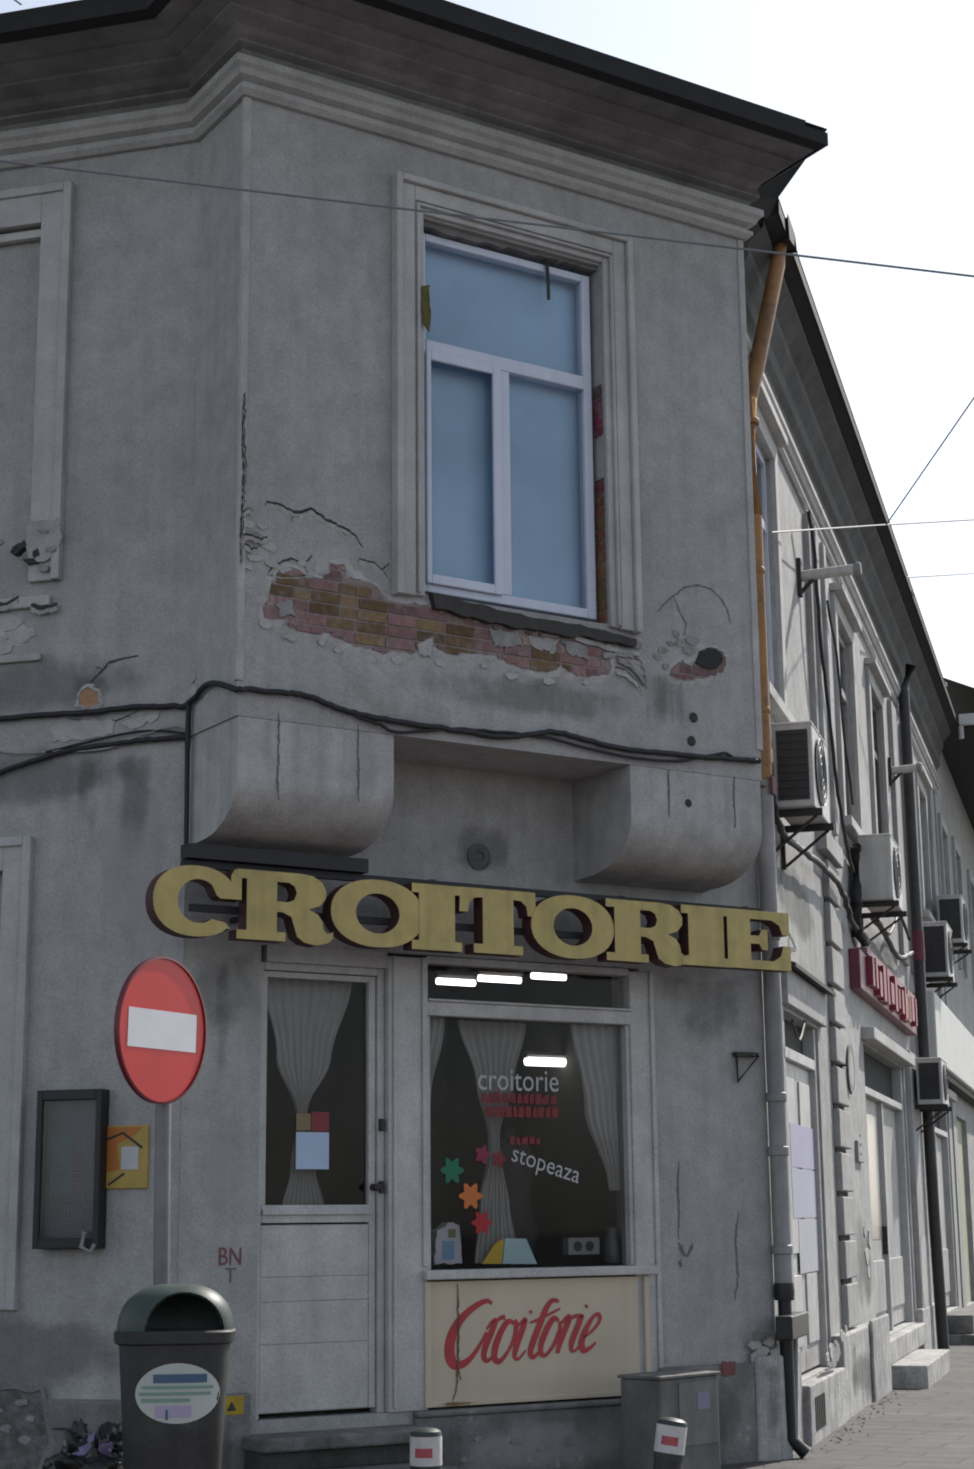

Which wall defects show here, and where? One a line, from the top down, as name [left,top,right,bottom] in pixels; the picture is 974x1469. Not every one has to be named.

flaking render [593,384,603,439]
crack [240,393,389,583]
flaking render [0,517,64,573]
flaking render [595,477,607,623]
flaking render [0,612,36,655]
flaking render [256,557,730,688]
flaking render [75,682,104,710]